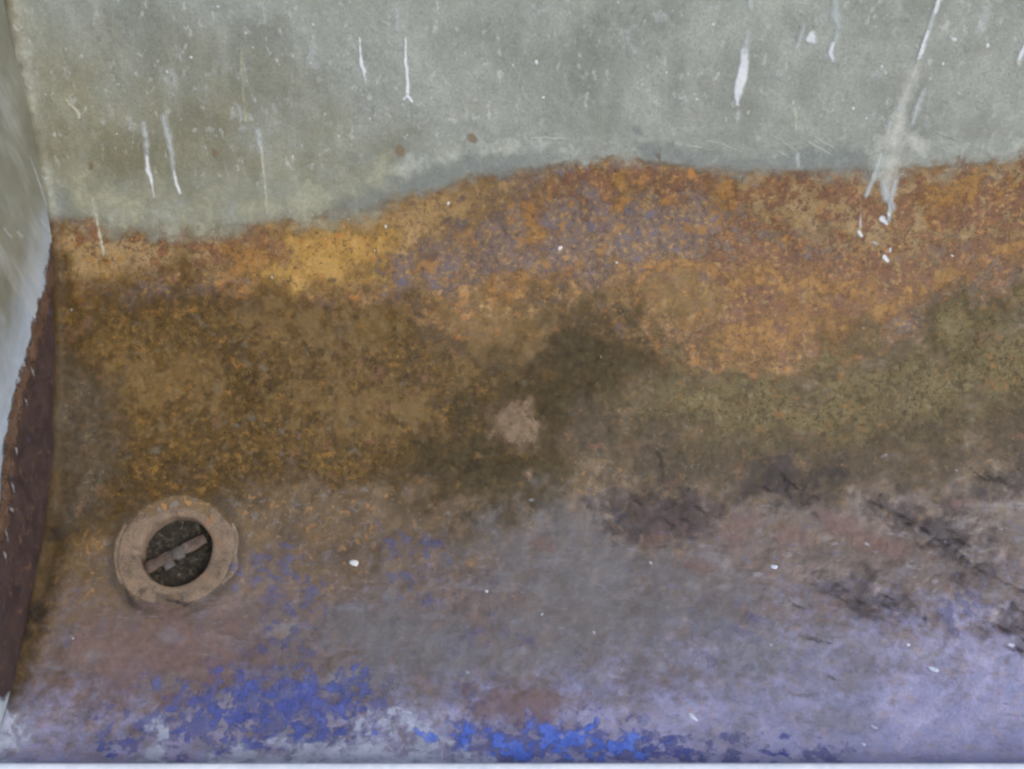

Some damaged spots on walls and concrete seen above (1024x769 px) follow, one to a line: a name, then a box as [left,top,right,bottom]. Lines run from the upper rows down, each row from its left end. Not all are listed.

damp [912,0,940,76]
damp [30,51,597,253]
damp [673,89,1024,225]
rust [0,149,1024,700]
peeling [96,656,841,763]